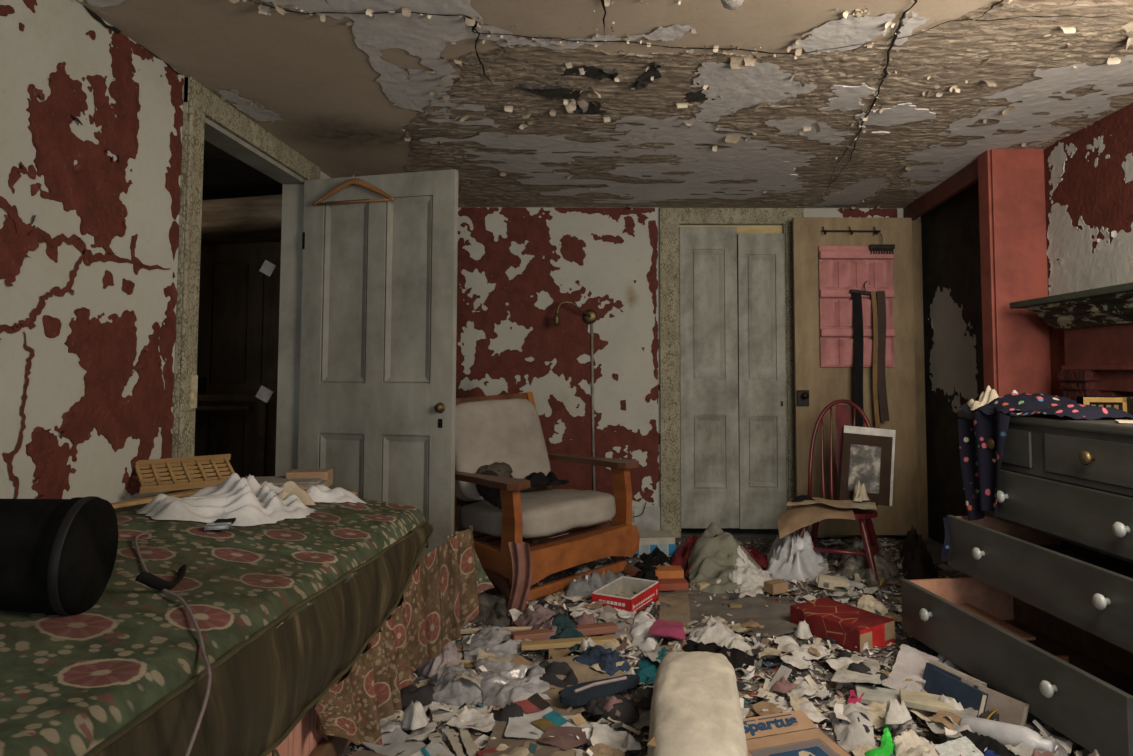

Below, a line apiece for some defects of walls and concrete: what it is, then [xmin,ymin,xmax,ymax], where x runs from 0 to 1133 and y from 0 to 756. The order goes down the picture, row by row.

peeling [0,0,37,31]
crack [85,6,183,75]
crack [242,0,1126,188]
peeling [0,29,184,499]
peeling [261,0,1133,505]